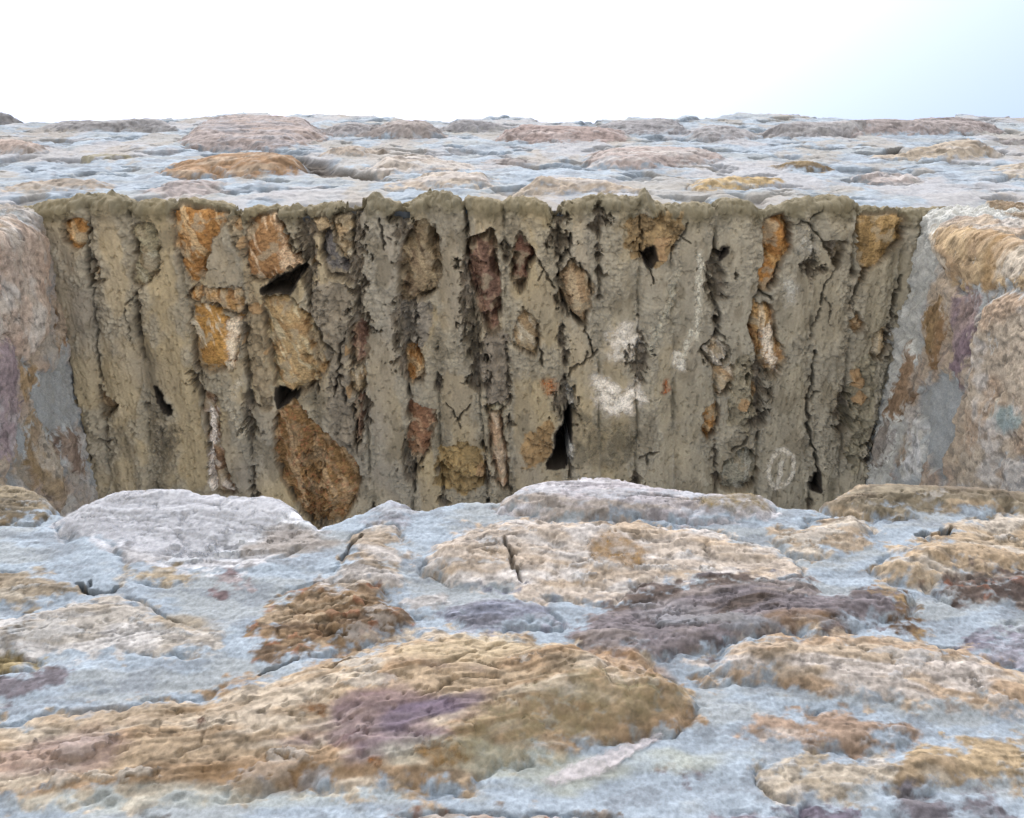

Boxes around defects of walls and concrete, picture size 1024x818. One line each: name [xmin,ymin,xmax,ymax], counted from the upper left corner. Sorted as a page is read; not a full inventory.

crack [84,222,105,389]
crack [122,287,141,351]
spalling [128,198,372,526]
crack [445,402,471,429]
spalling [395,218,557,497]
crack [535,232,599,381]
crack [696,279,727,353]
spalling [698,211,796,494]
crack [752,289,774,301]
crack [784,212,823,243]
crack [804,269,861,476]
spalling [822,206,909,284]